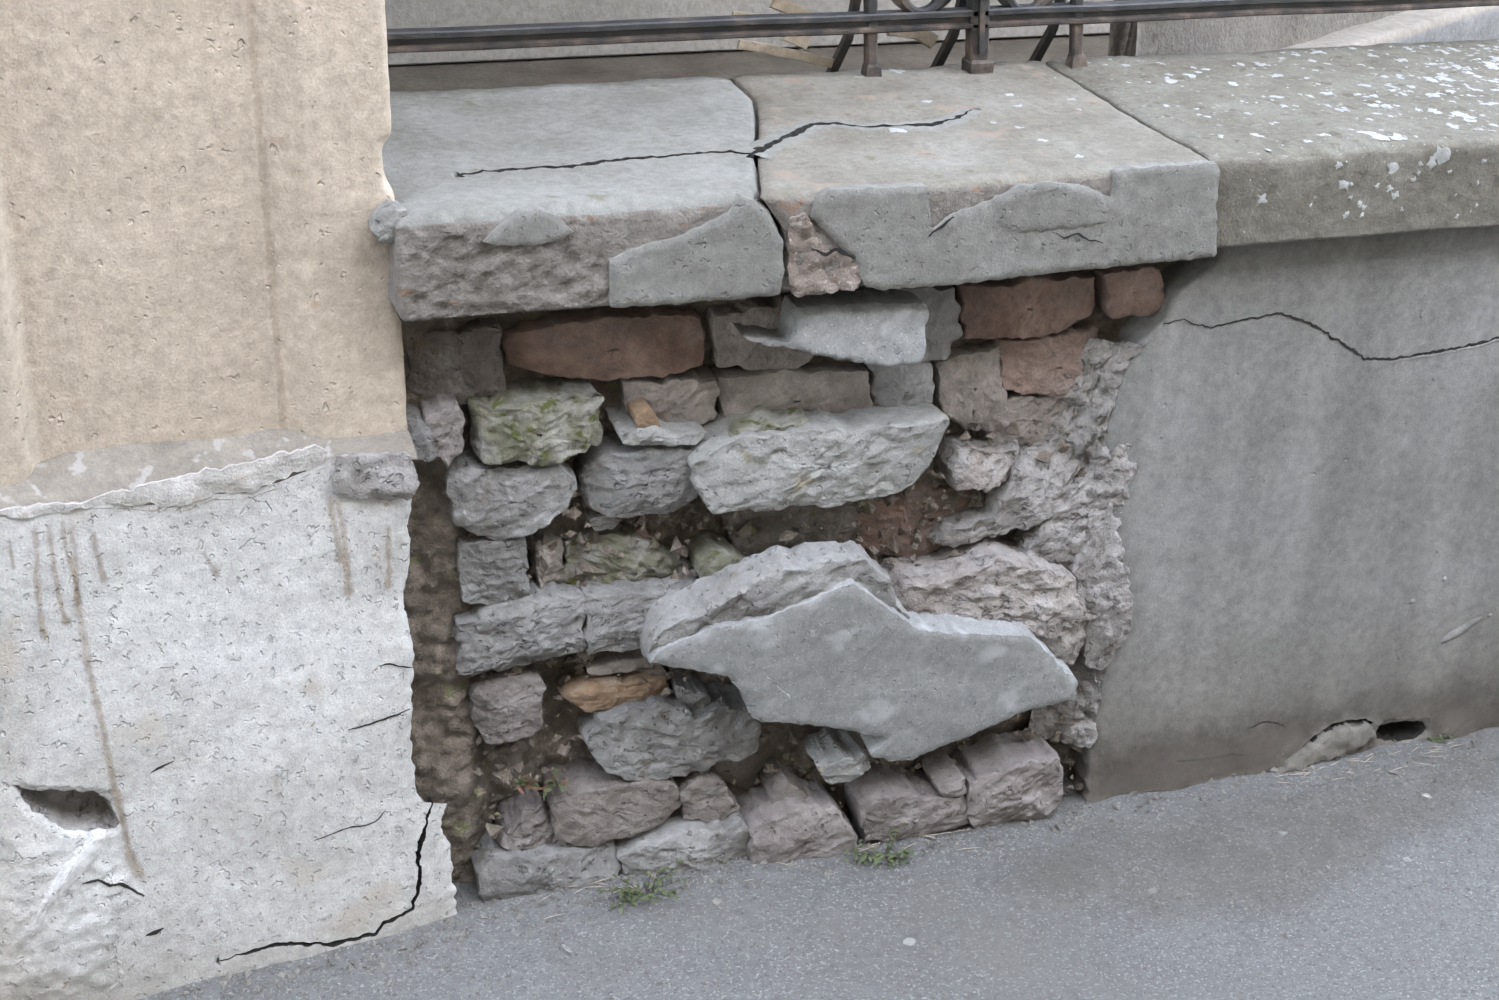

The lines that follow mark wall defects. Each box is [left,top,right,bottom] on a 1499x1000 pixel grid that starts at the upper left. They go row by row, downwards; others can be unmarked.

crack [454,108,981,179]
crack [1163,312,1499,363]
spalling [1047,337,1145,471]
spalling [639,540,1108,762]
spalling [1276,709,1433,774]
spalling [10,782,126,839]
crack [217,797,447,970]